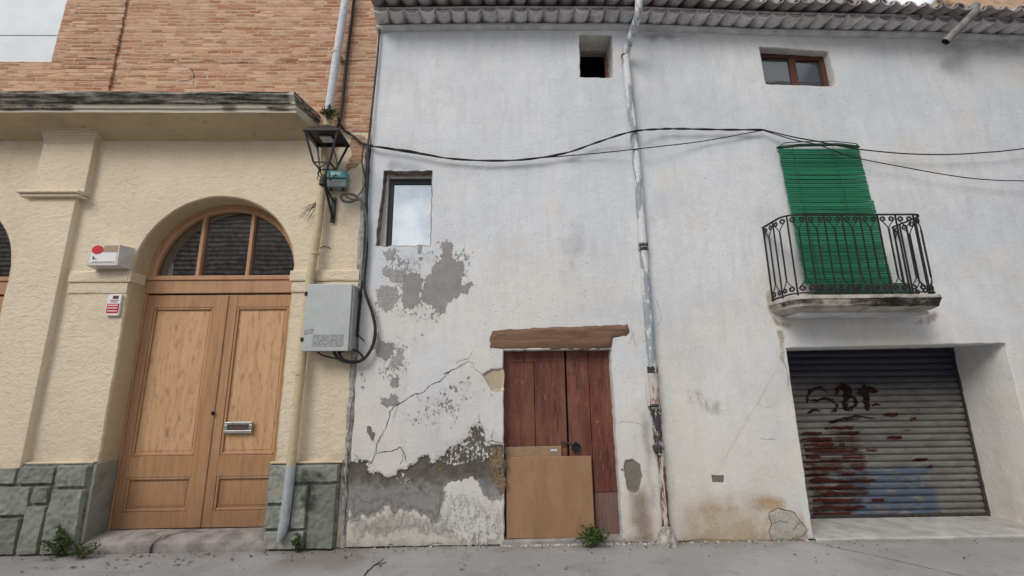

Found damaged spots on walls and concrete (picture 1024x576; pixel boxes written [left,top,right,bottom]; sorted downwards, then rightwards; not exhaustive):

mould [0,91,321,125]
peeling [360,241,474,407]
crack [341,351,499,576]
spalling [341,376,507,524]
spalling [483,368,504,396]
spalling [621,459,642,492]